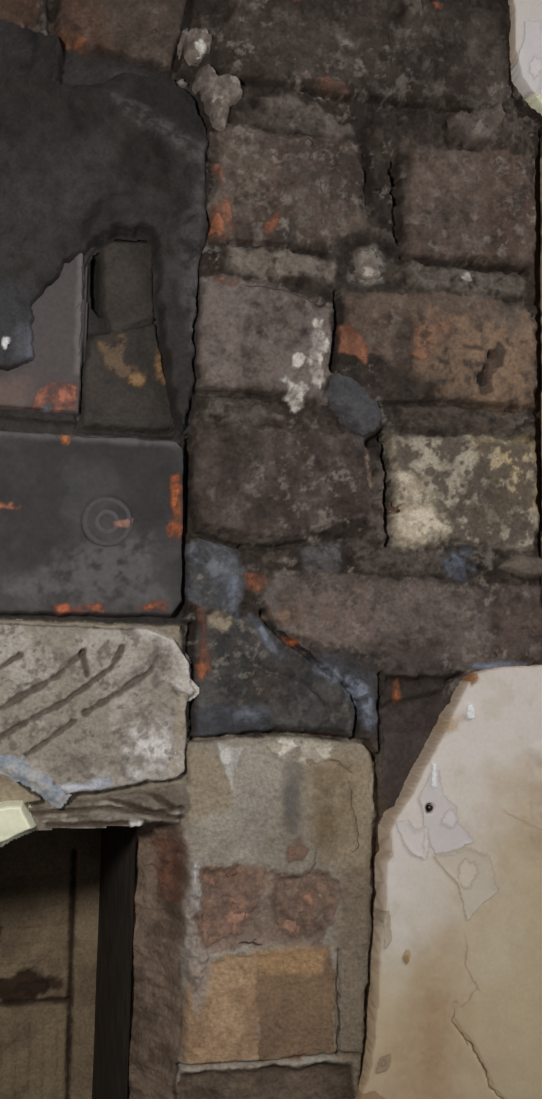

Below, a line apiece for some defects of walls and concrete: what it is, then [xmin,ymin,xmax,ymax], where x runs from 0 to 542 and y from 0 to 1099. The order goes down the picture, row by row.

spalling [31,383,77,413]
spalling [97,333,166,386]
peeling [420,762,474,856]
crack [452,933,503,1099]